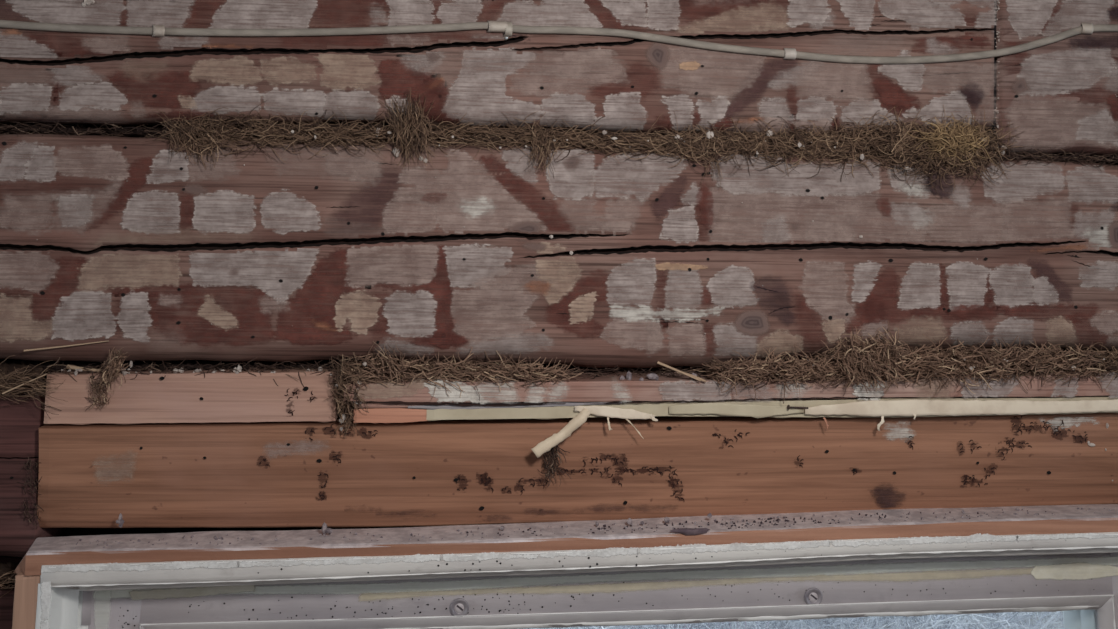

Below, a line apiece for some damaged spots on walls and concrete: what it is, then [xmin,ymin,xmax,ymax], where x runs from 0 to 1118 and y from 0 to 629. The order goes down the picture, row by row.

peeling [374,0,483,67]
crack [0,16,993,66]
peeling [441,48,647,132]
peeling [497,0,1118,247]
peeling [0,142,129,231]
peeling [120,150,321,234]
peeling [0,248,319,342]
crack [0,232,1118,270]
peeling [333,149,803,357]
peeling [803,261,881,343]
peeling [862,261,1076,348]
peeling [1079,261,1118,289]